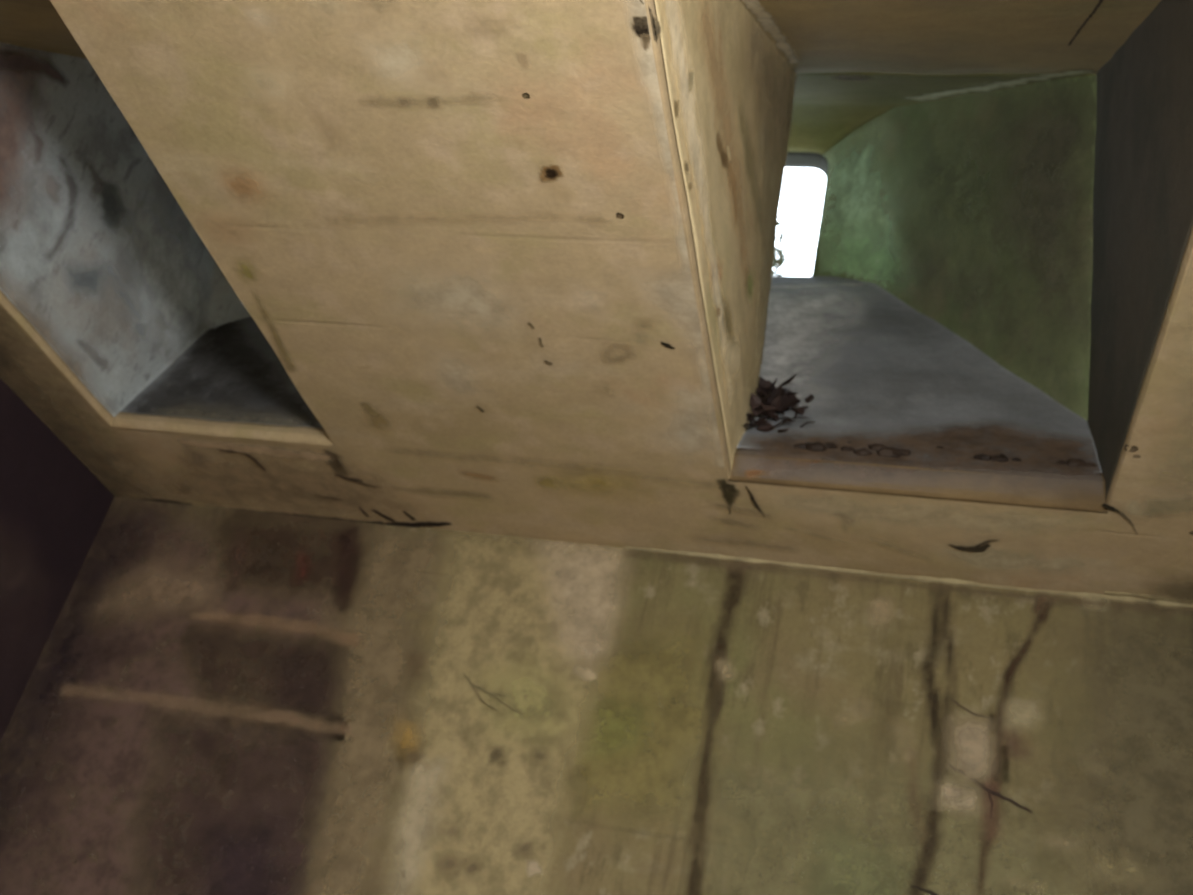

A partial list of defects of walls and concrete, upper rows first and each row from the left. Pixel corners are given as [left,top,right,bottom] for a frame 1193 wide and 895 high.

crack [949,764,1032,818]
crack [911,885,938,895]